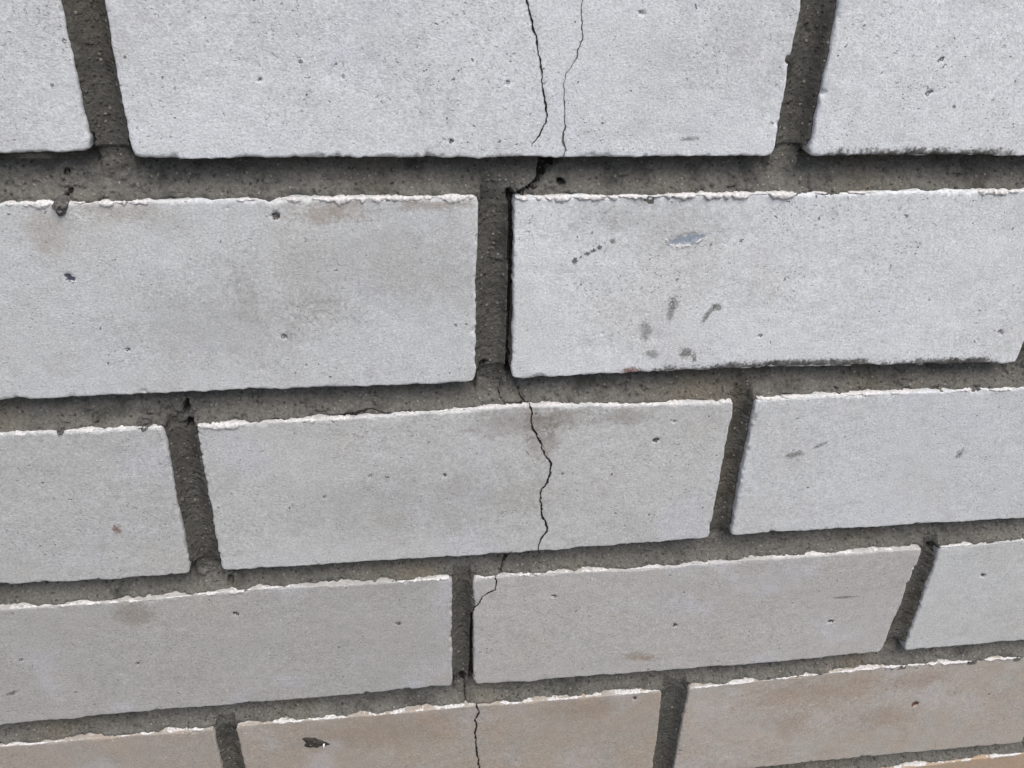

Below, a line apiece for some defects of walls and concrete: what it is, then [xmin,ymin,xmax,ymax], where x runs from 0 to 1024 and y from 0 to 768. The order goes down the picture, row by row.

crack [498,0,584,554]
crack [463,553,509,768]